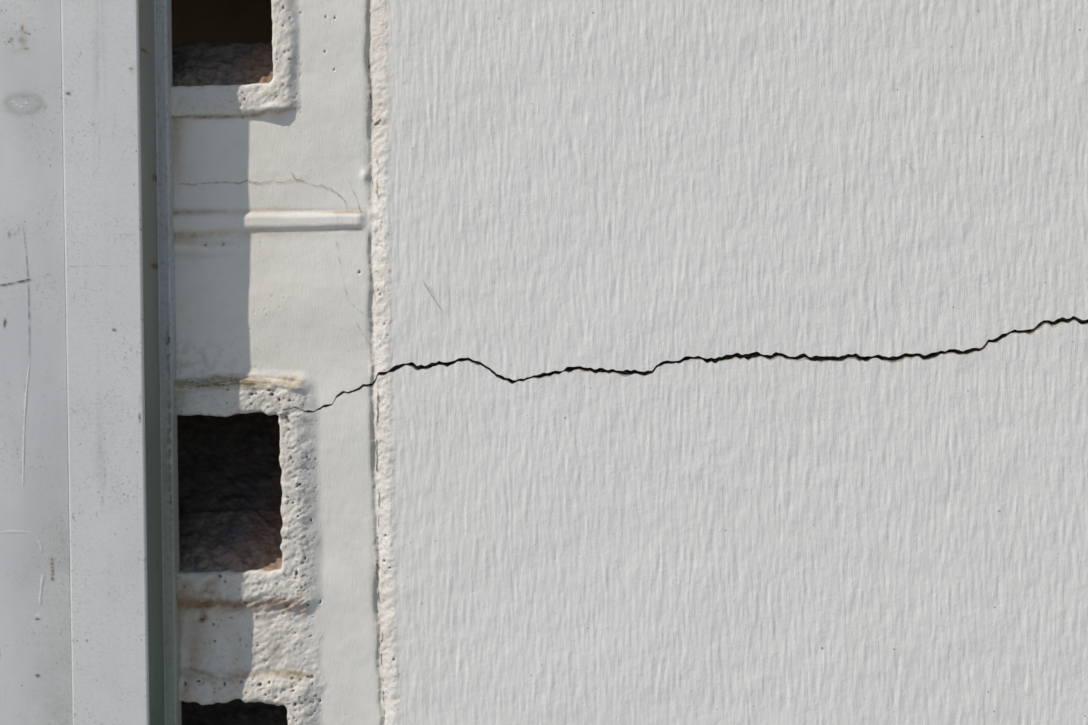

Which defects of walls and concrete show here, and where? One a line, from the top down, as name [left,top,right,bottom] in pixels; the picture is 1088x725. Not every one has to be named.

crack [283,316,1088,602]